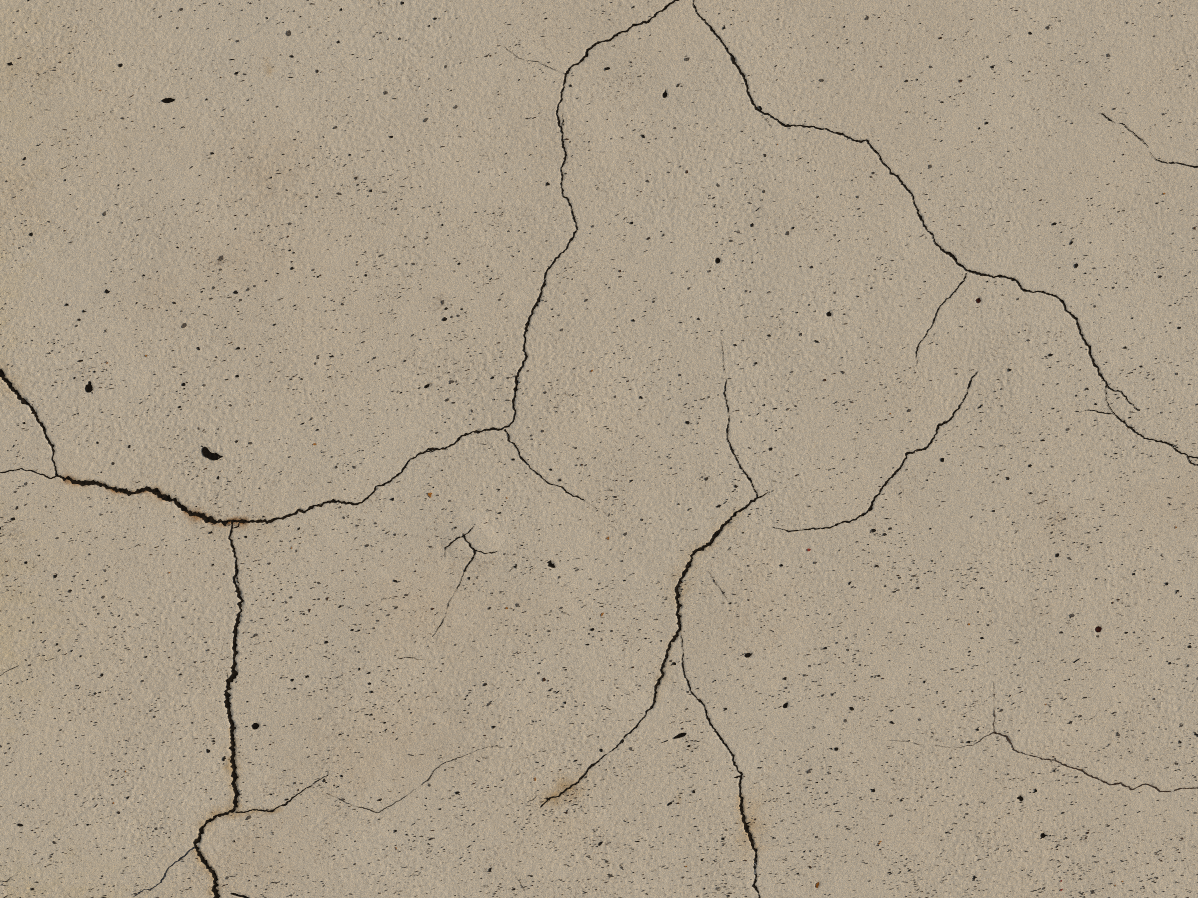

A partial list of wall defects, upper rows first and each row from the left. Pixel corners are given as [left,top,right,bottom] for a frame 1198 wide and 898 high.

crack [0,0,679,898]
crack [530,340,773,898]
crack [774,372,978,532]
crack [693,0,1198,466]
crack [890,695,1198,792]